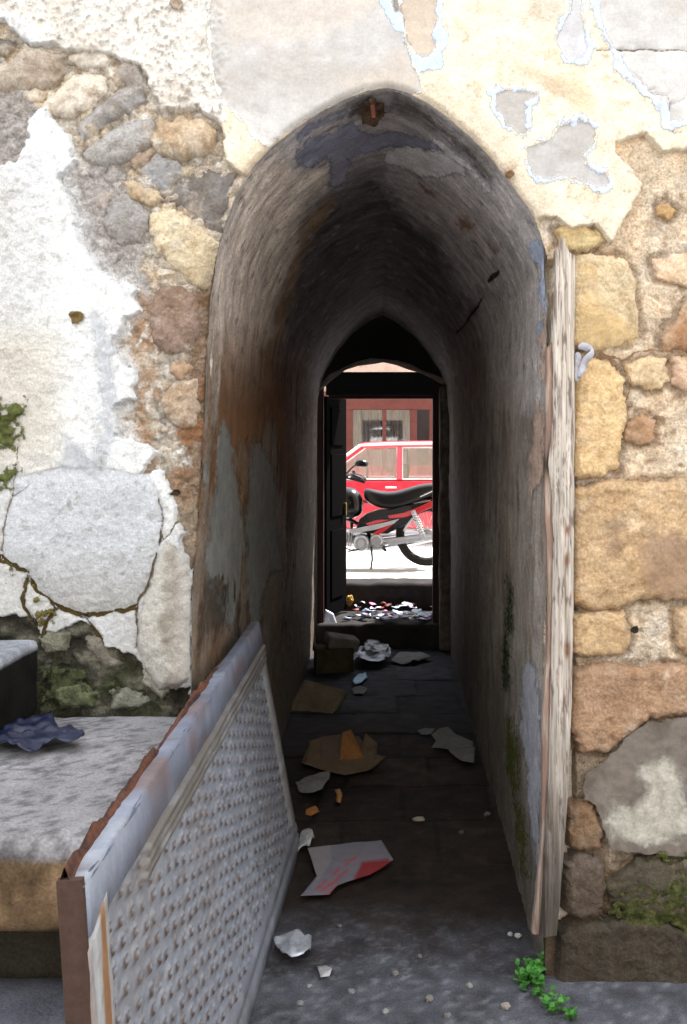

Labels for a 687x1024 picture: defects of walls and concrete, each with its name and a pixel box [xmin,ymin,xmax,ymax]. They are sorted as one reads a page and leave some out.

peeling [205,0,491,193]
peeling [486,83,613,194]
peeling [554,0,687,132]
flaking render [0,22,248,629]
crack [0,447,179,648]
flaking render [527,136,687,984]
flaking render [0,614,192,718]